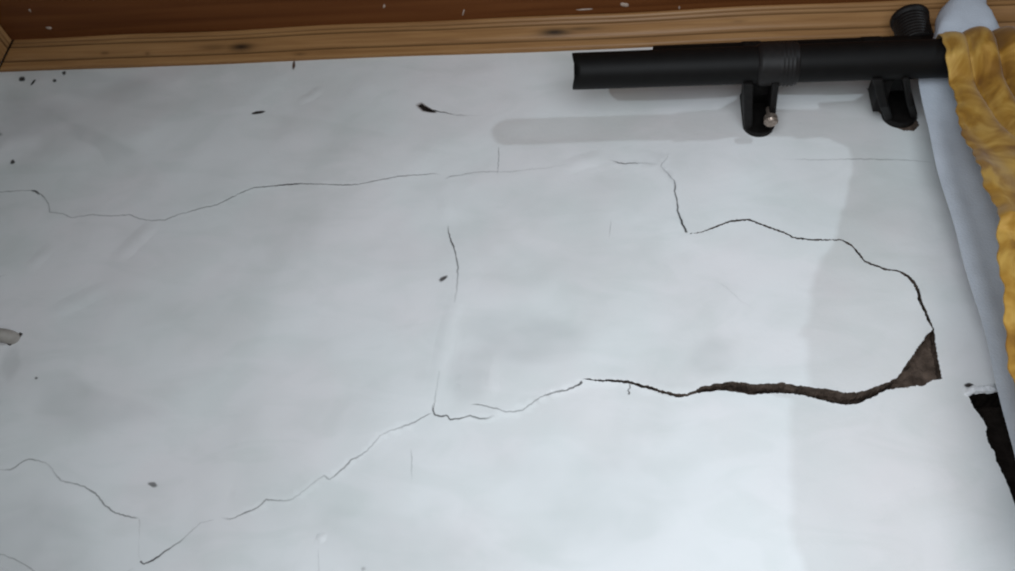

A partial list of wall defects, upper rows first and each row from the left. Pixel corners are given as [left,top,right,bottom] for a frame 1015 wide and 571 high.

crack [674,186,942,405]